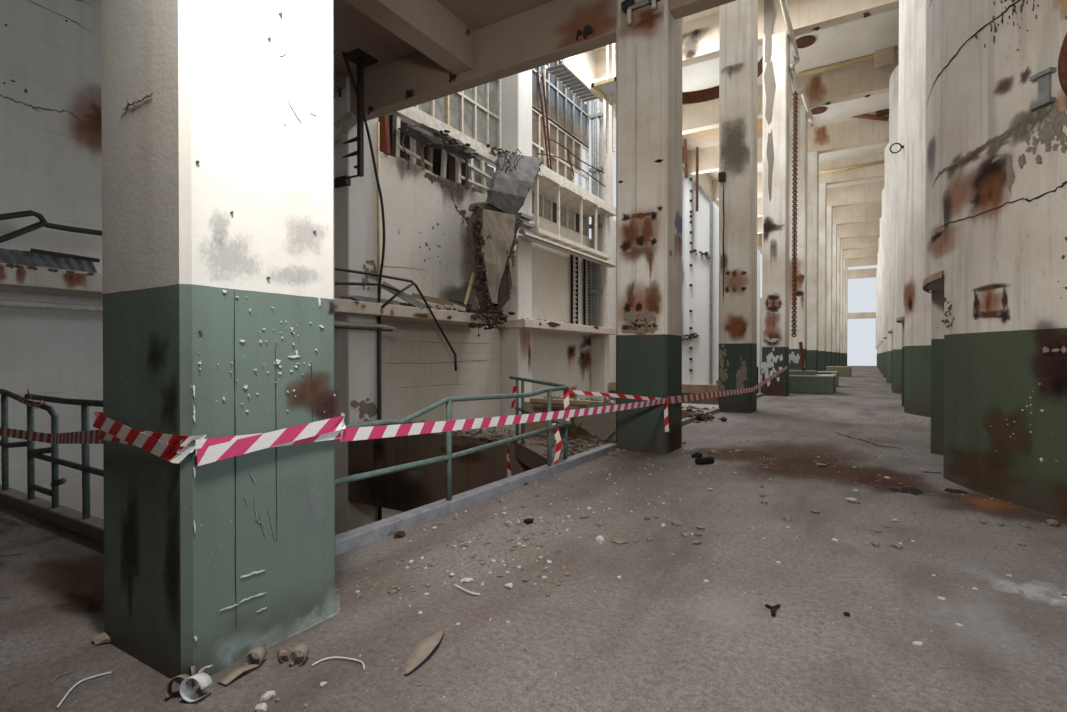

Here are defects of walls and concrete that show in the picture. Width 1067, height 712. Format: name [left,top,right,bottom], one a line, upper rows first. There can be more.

crack [28,0,96,33]
crack [926,0,1035,108]
crack [0,94,92,124]
peeling [991,95,1067,193]
spalling [424,173,476,193]
corrosion [944,158,1006,216]
crack [939,181,1067,228]
spalling [455,159,544,310]
corrosion [621,206,662,273]
corrosion [622,284,659,335]
corrosion [973,284,1010,322]
peeling [716,337,800,396]